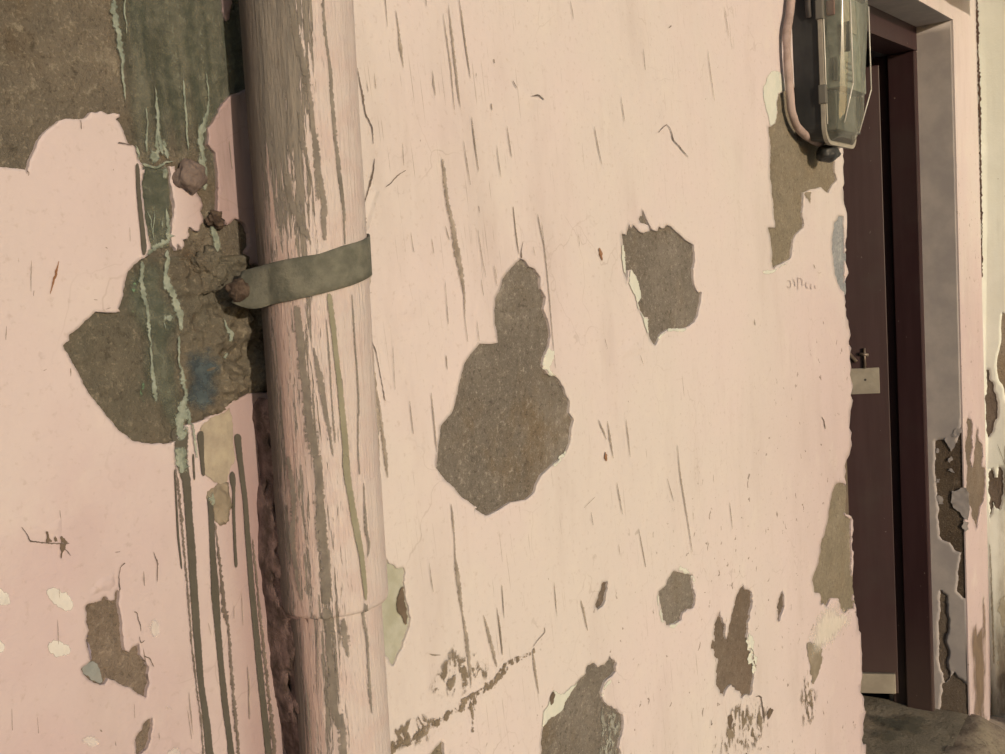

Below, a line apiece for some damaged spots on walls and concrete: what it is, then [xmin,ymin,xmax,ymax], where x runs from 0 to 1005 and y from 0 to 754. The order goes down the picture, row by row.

peeling [0,0,267,444]
peeling [622,215,700,344]
peeling [763,71,835,274]
peeling [436,260,571,515]
peeling [81,591,147,696]
peeling [382,561,409,664]
spalling [390,648,535,754]
peeling [541,659,622,754]
peeling [657,566,695,628]
peeling [711,587,774,754]
peeling [812,483,855,613]
peeling [935,312,1005,714]